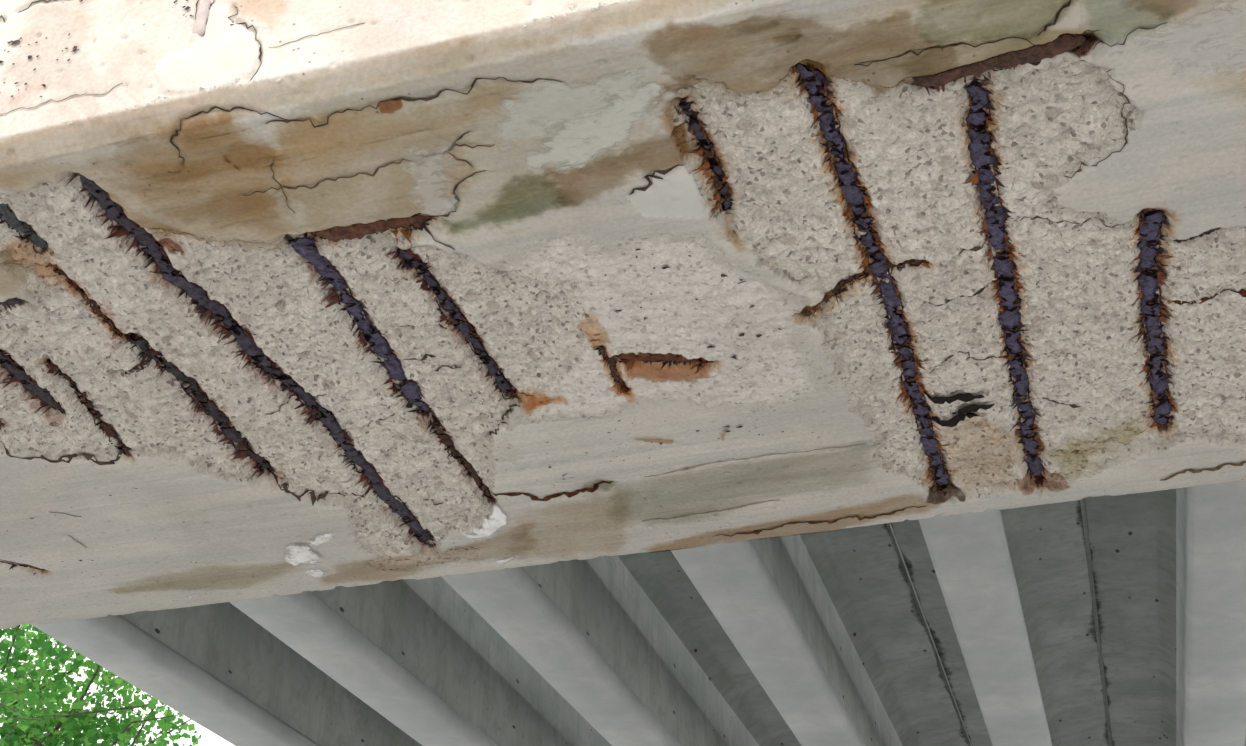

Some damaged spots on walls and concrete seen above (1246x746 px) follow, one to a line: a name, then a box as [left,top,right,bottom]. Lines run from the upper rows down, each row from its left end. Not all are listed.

crack [855,0,1071,67]
damp [1143,0,1246,76]
crack [0,83,123,115]
crack [170,0,562,165]
damp [500,71,662,171]
crack [243,131,495,250]
damp [409,148,451,214]
spalling [624,2,1246,501]
spalling [0,172,715,572]
rust [928,477,965,504]
spalling [0,556,46,576]